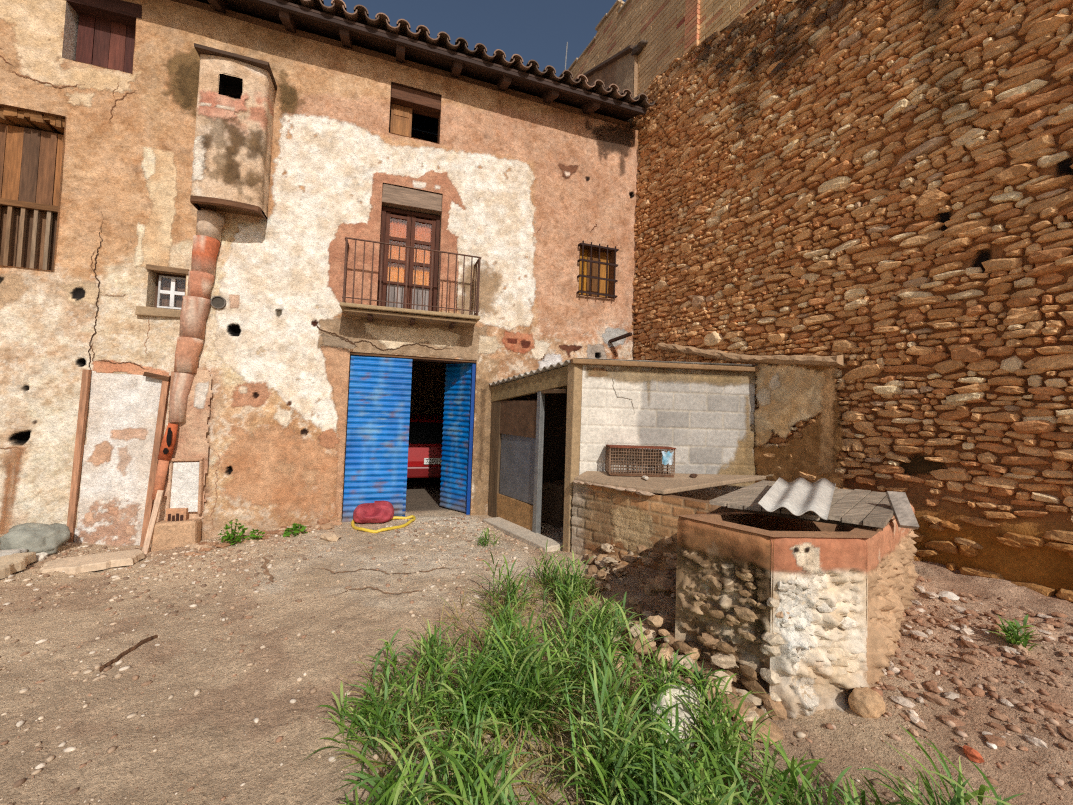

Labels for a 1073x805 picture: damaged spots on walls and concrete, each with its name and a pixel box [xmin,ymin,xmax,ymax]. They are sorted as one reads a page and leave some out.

crack [108,83,139,124]
water stain [164,48,200,116]
water stain [281,71,298,113]
water stain [223,119,262,185]
flaking render [558,164,590,181]
water stain [586,122,634,174]
crack [88,212,126,395]
peeling [214,113,582,541]
flaking render [753,365,837,446]